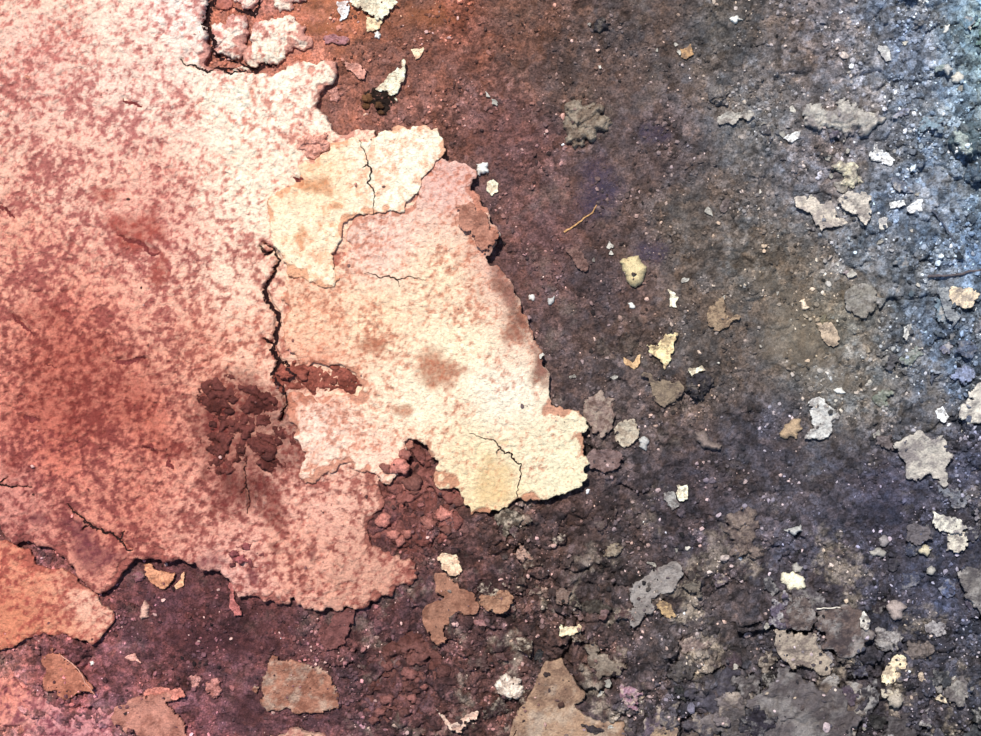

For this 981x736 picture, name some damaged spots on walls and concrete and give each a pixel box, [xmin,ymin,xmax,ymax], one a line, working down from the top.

crack [180,0,277,75]
peeling [344,62,366,79]
flaking render [360,47,424,115]
crack [359,140,376,215]
crack [364,272,424,287]
crack [260,243,297,421]
peeling [197,125,640,725]
spalling [142,443,174,469]
peeling [144,563,185,589]
peeling [41,648,95,700]
peeling [144,687,186,700]
peeling [436,709,479,733]